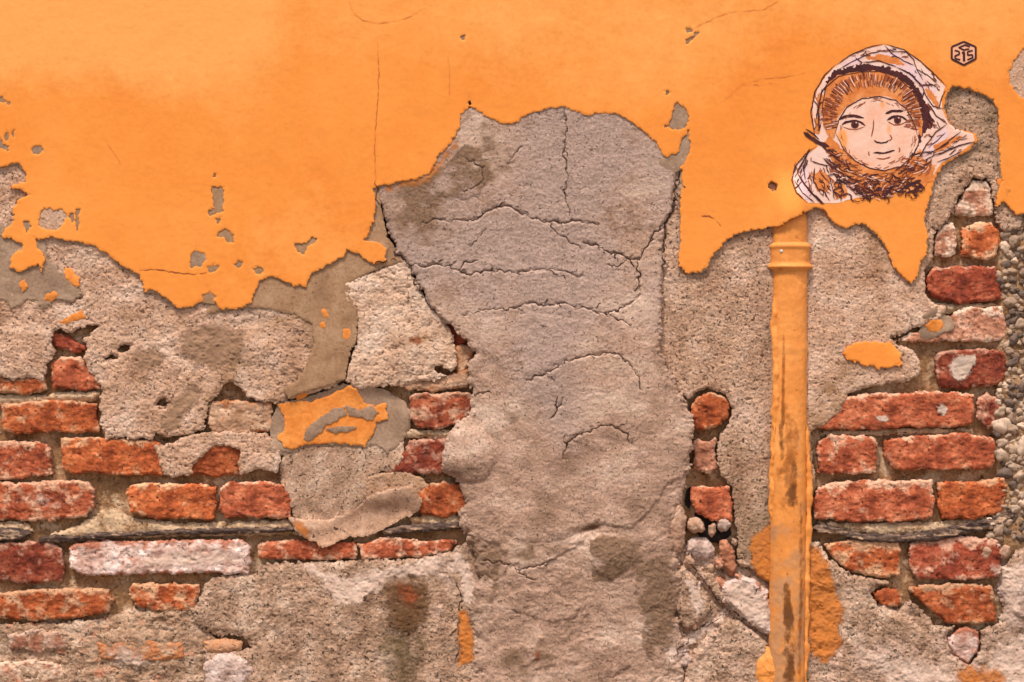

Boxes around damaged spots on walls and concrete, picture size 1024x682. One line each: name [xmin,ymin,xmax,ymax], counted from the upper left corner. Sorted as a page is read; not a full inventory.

spalling [0,165,481,682]
water stain [305,550,475,681]
crack [350,6,686,328]
crack [531,352,641,457]
spalling [659,90,773,682]
spalling [805,87,1024,682]